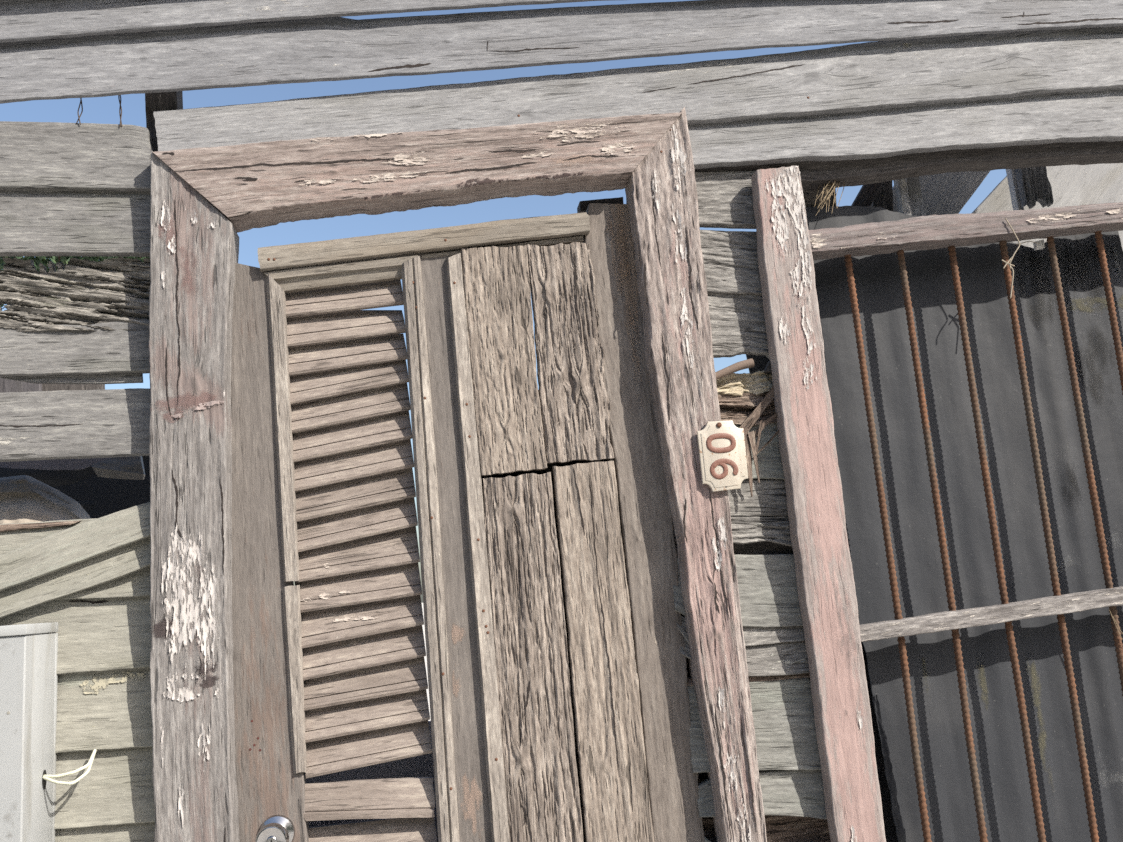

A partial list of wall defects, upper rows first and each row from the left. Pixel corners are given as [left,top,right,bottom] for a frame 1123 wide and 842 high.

peeling [522,123,642,158]
peeling [765,166,821,389]
peeling [161,525,220,702]
crack [574,470,620,774]
peeling [80,672,145,694]
crack [523,681,531,716]
crack [520,782,548,842]